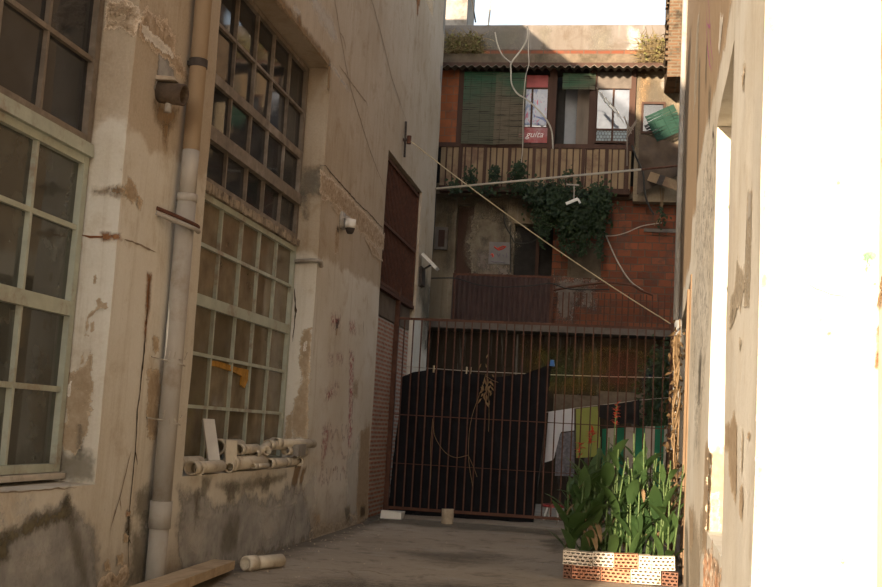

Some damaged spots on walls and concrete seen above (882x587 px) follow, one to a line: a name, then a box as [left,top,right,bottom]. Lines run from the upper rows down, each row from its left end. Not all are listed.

flaking render [103,0,189,85]
peeling [679,0,732,430]
flaking render [729,0,774,357]
peeling [62,352,94,456]
peeling [284,327,313,439]
peeling [685,371,764,587]